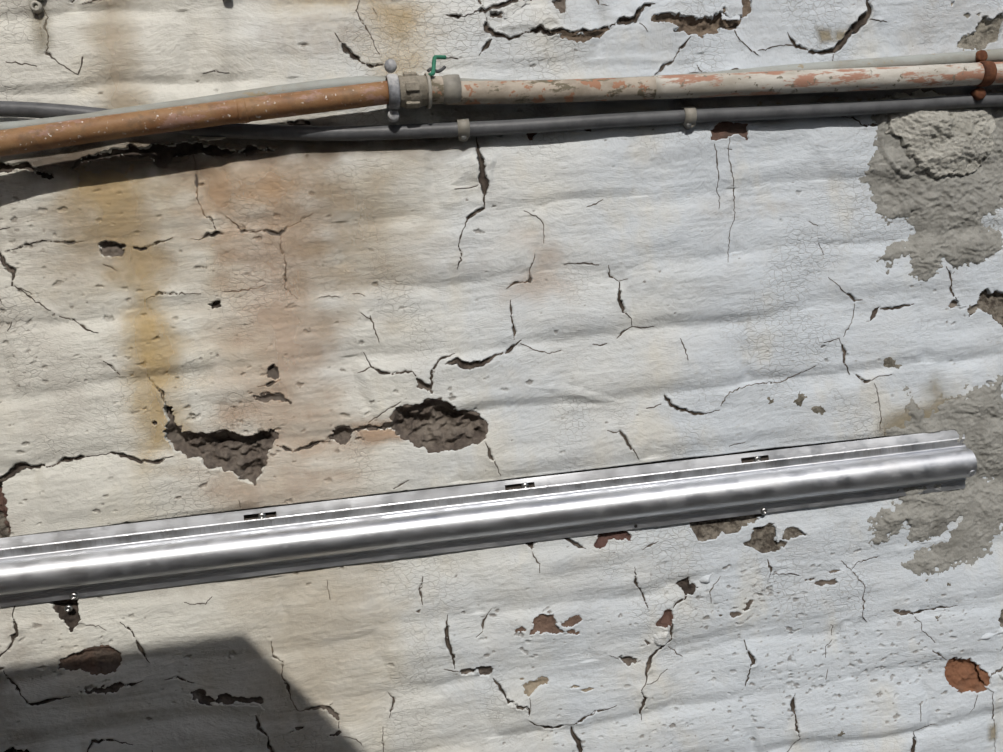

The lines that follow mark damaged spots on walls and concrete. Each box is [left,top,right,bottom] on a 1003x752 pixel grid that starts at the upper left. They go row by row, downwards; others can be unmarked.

crack [446,0,655,59]
crack [731,0,887,70]
crack [128,167,561,391]
crack [566,262,654,346]
spalling [948,289,1003,327]
spalling [164,406,279,486]
spalling [328,378,488,453]
spalling [0,478,11,538]
flaking render [58,643,125,695]
crack [444,615,459,672]
crack [493,576,721,752]
flaking render [944,657,990,693]